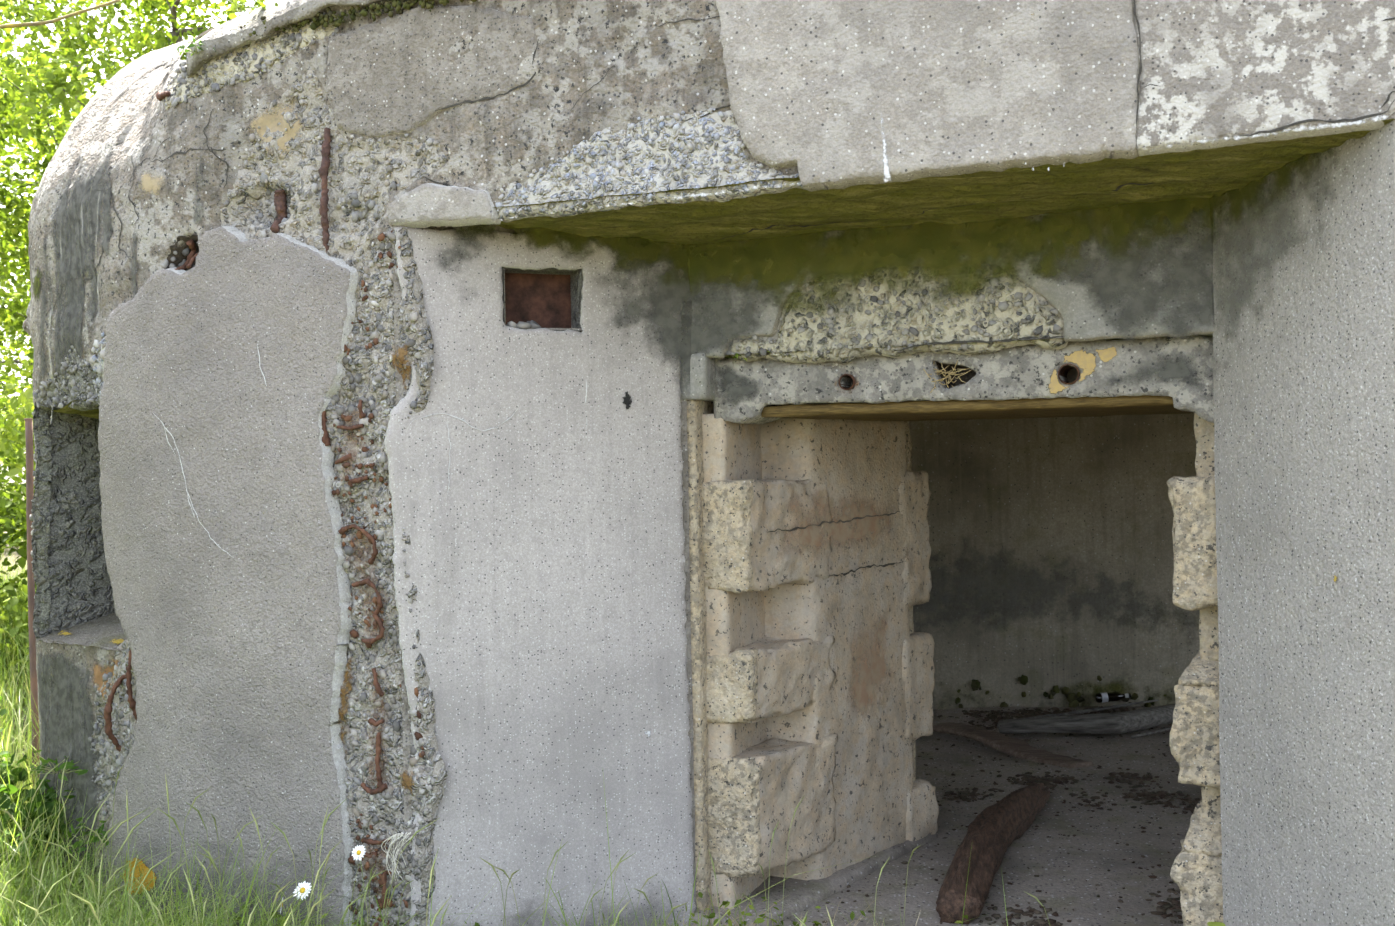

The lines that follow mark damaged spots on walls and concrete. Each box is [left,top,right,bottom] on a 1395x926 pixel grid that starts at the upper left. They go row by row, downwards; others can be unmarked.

spalling [163,11,345,110]
crack [1134,0,1158,145]
corrosion [270,189,287,233]
corrosion [318,127,332,253]
spalling [495,108,803,223]
corrosion [321,400,365,465]
spalling [220,70,448,926]
corrosion [338,524,385,644]
corrosion [93,649,137,752]
corrosion [338,657,353,753]
corrosion [372,668,384,697]
corrosion [360,718,414,795]